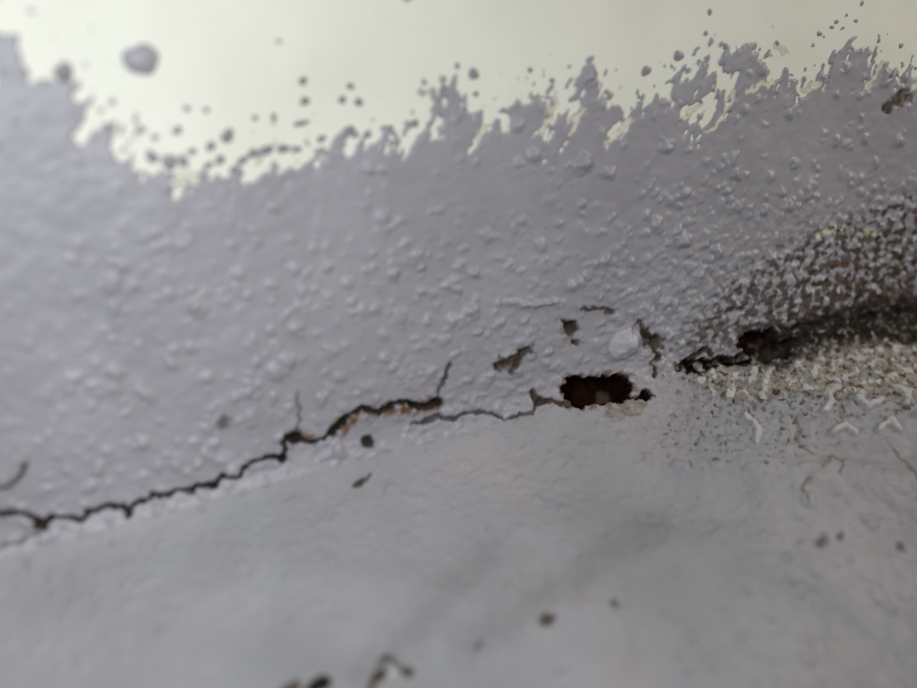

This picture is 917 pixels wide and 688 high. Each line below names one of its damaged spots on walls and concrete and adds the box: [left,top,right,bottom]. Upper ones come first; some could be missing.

peeling [603,117,634,147]
peeling [702,79,775,134]
peeling [812,224,846,240]
spalling [529,372,655,419]
spalling [637,319,665,378]
flaking render [674,310,917,442]
water stain [760,296,917,371]
crack [0,362,536,546]